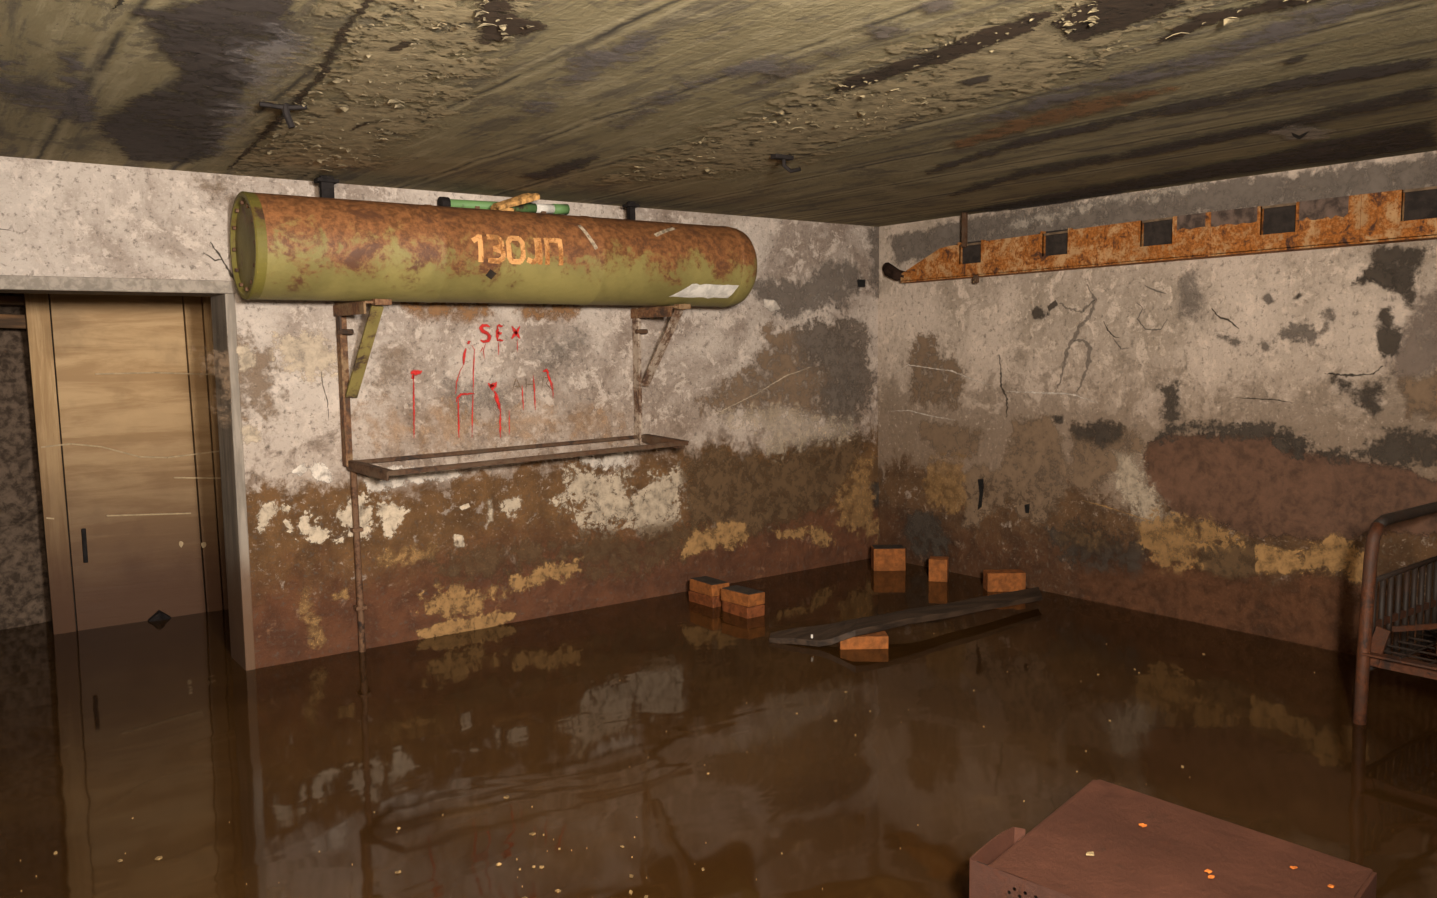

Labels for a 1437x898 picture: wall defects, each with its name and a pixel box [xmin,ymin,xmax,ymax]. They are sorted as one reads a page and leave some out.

leakage [0,0,312,164]
leakage [950,0,1404,128]
leakage [925,58,1437,174]
leakage [695,86,1437,580]
crack [1104,285,1167,349]
leakage [377,544,439,567]
leakage [509,557,582,594]
leakage [300,596,326,645]
flaking render [416,582,516,639]